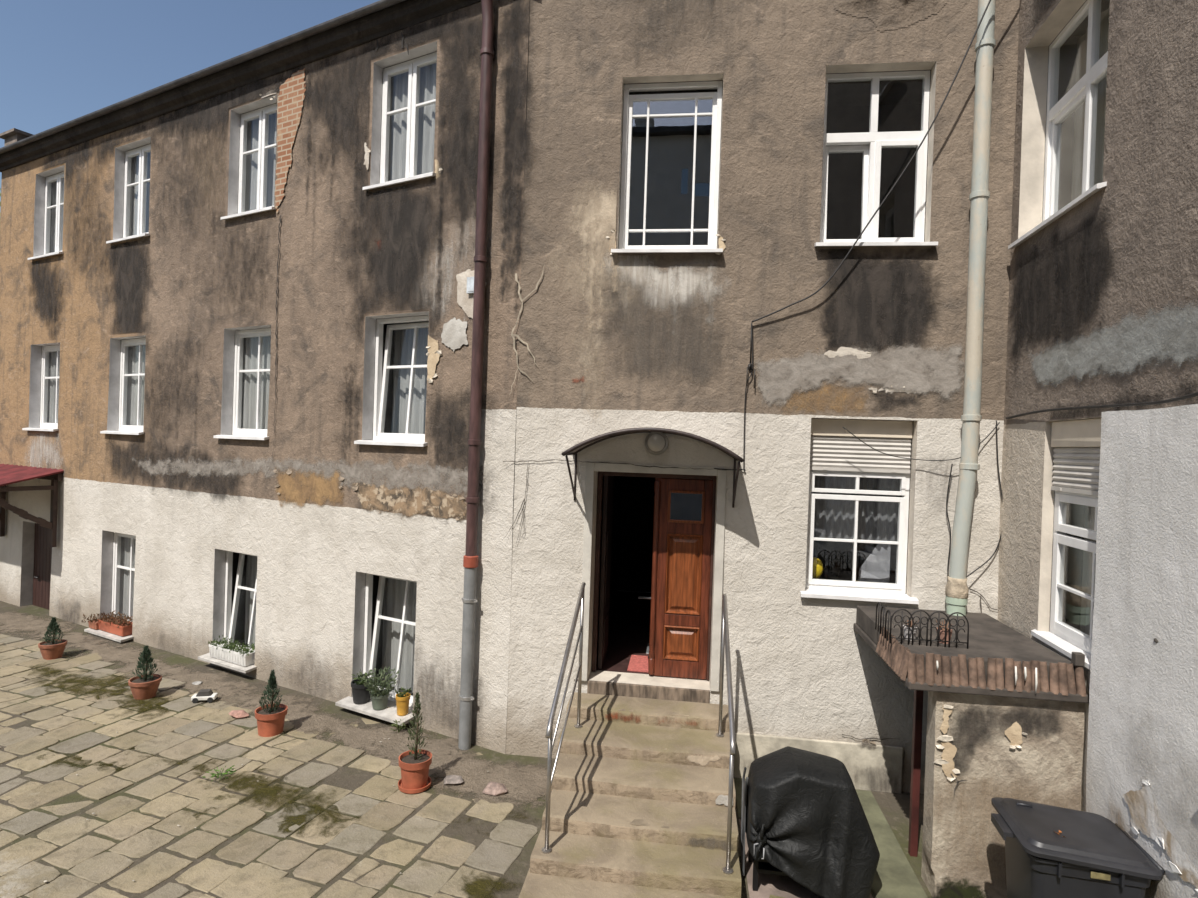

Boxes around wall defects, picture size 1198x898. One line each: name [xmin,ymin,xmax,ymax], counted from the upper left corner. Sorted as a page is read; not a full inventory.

flaking render [259,68,306,213]
leakage [573,191,720,383]
crack [509,265,545,395]
spalling [824,347,871,359]
spalling [868,385,917,394]
spalling [273,469,467,521]
spalling [934,705,960,781]
spalling [1005,721,1027,749]
peeling [1123,780,1198,892]